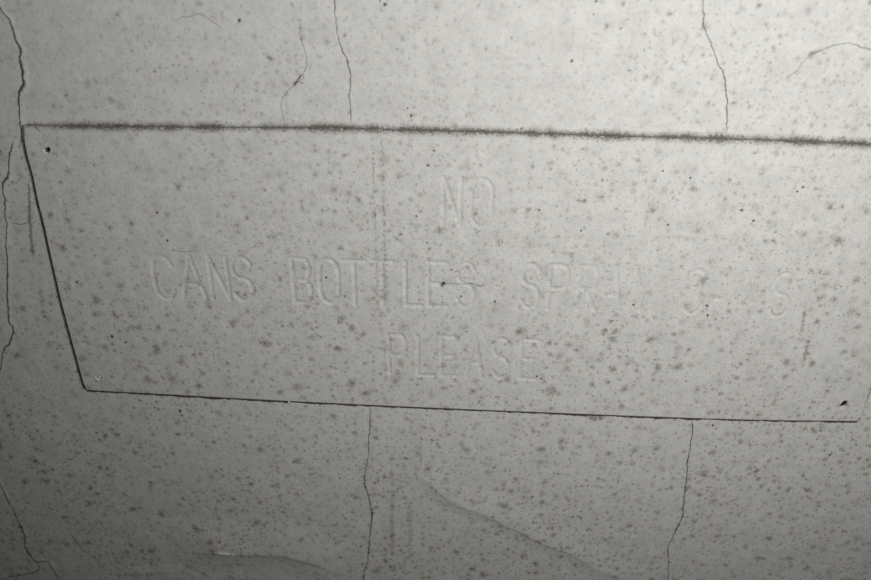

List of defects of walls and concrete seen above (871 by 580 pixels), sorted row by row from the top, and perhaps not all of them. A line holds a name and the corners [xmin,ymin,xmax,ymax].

crack [703,1,728,127]
crack [0,0,31,384]
crack [363,409,373,580]
crack [667,423,693,580]